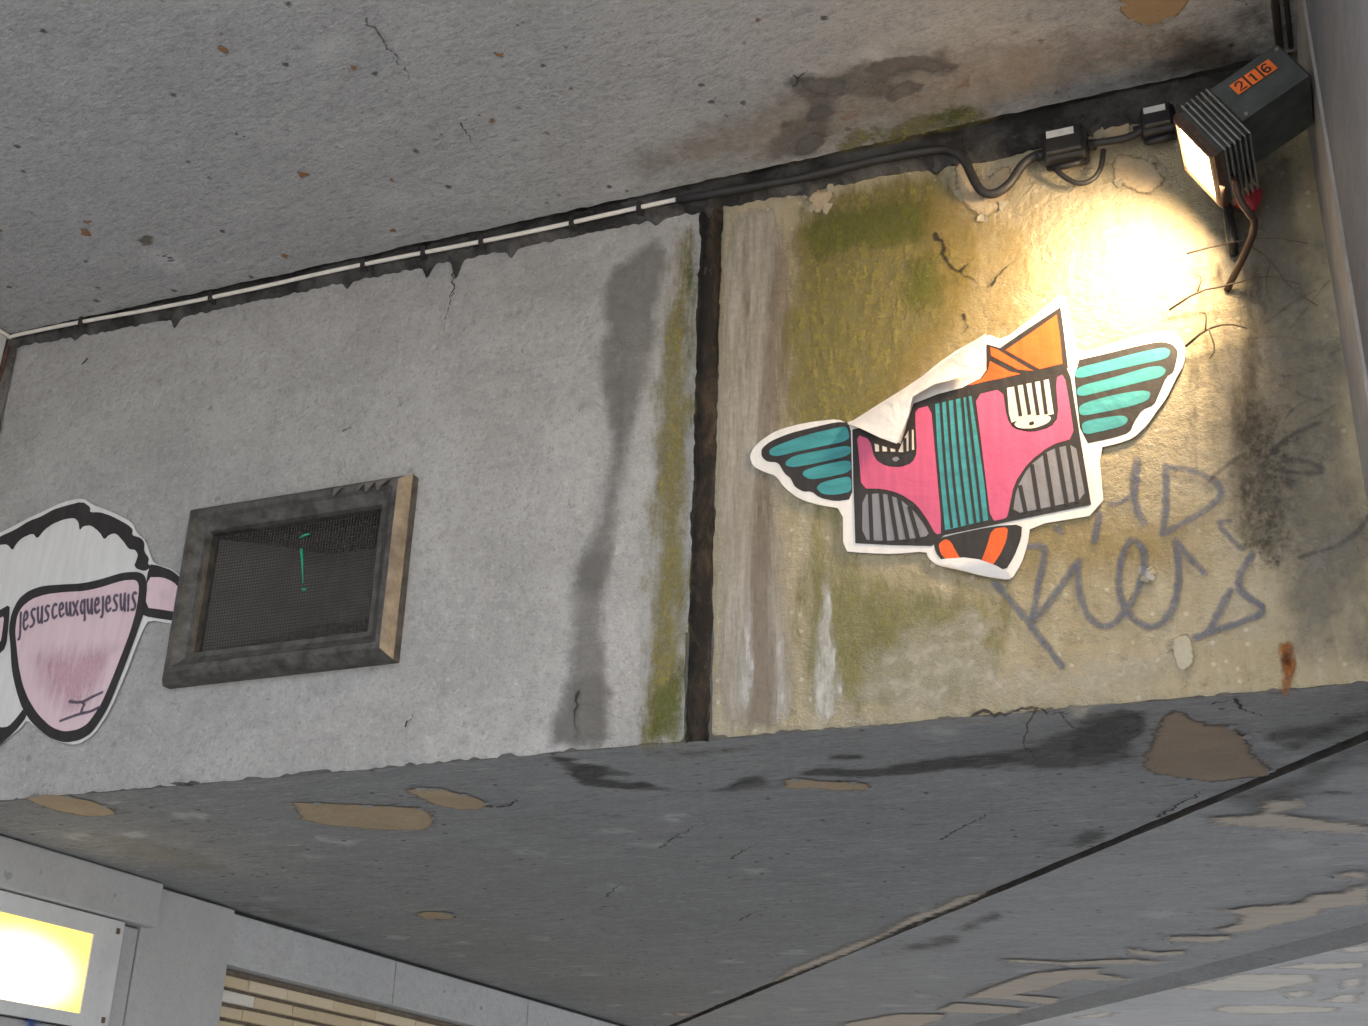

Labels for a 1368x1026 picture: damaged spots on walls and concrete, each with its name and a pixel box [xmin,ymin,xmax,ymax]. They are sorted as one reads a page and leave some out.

water stain [748,56,958,155]
water stain [1212,154,1368,628]
water stain [557,246,662,742]
rust [1280,642,1296,695]
peeling [292,787,493,830]
water stain [555,758,654,789]
water stain [803,710,1143,777]
crack [971,706,1075,761]
peeling [1141,710,1276,783]
peeling [1205,798,1368,834]
peeling [773,890,986,981]
peeling [844,871,1368,1026]